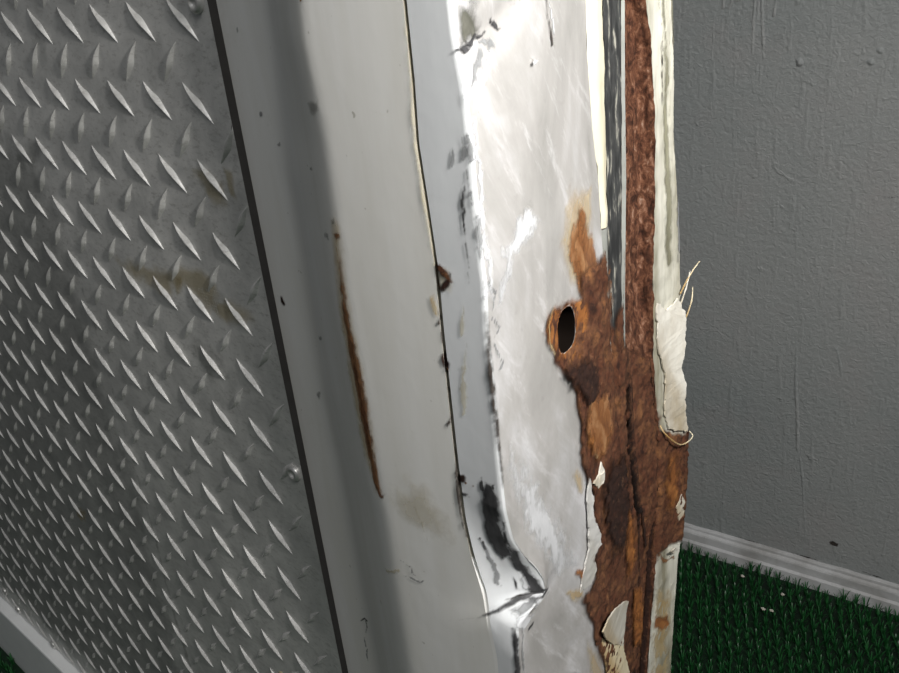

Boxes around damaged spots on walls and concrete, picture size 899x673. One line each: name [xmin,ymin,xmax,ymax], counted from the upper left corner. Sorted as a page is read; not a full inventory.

peeling [473,120,536,301]
corrosion [340,278,383,498]
peeling [514,468,573,573]
peeling [579,445,605,593]
corrosion [547,208,689,673]
peeling [655,261,700,446]
peeling [676,494,685,520]
peeling [602,601,630,673]